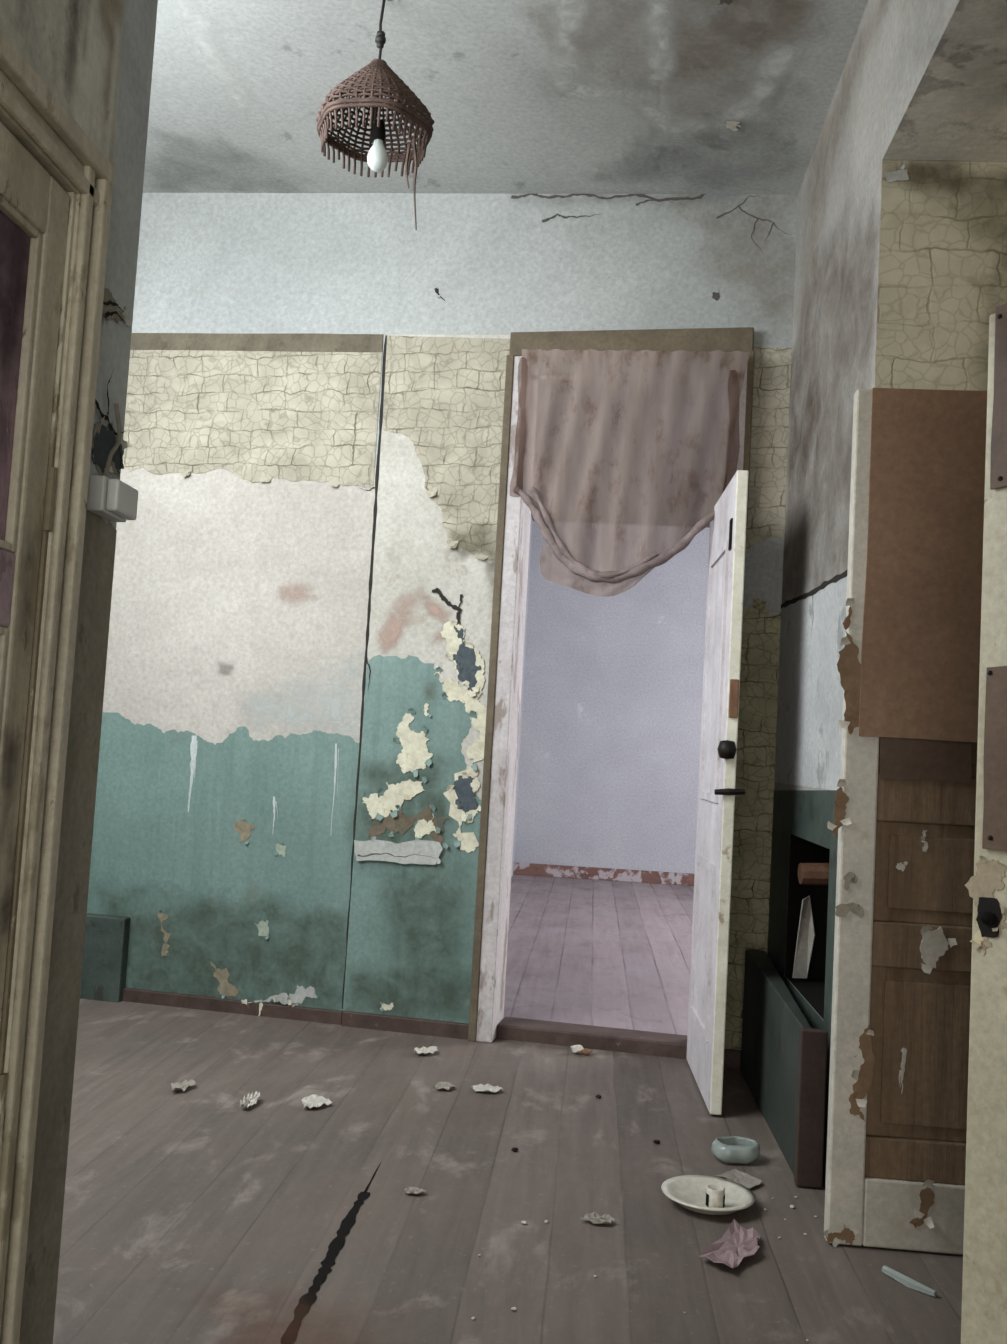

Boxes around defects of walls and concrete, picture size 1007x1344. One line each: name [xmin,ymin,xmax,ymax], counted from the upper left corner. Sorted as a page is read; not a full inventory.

leakage [554,0,793,133]
crack [511,193,791,253]
peeling [362,621,487,853]
crack [280,1163,381,1344]